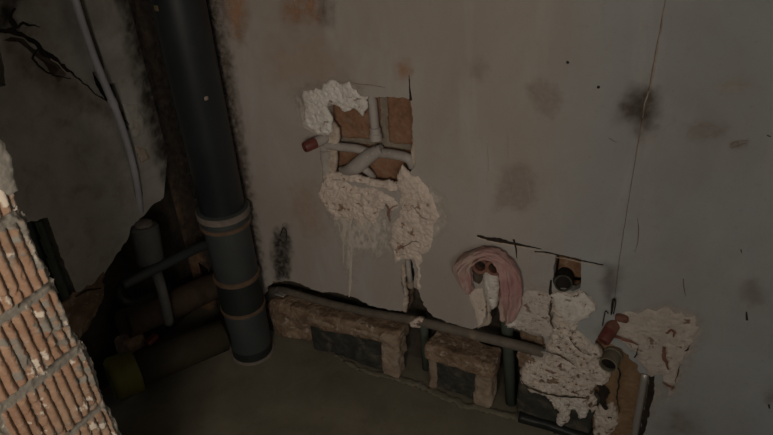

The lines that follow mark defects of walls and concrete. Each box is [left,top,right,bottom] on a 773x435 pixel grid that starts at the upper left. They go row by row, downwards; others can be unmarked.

crack [0,8,108,103]
crack [612,0,666,314]
flaking render [0,139,121,435]
damp [274,227,290,280]
flaking render [507,254,701,435]